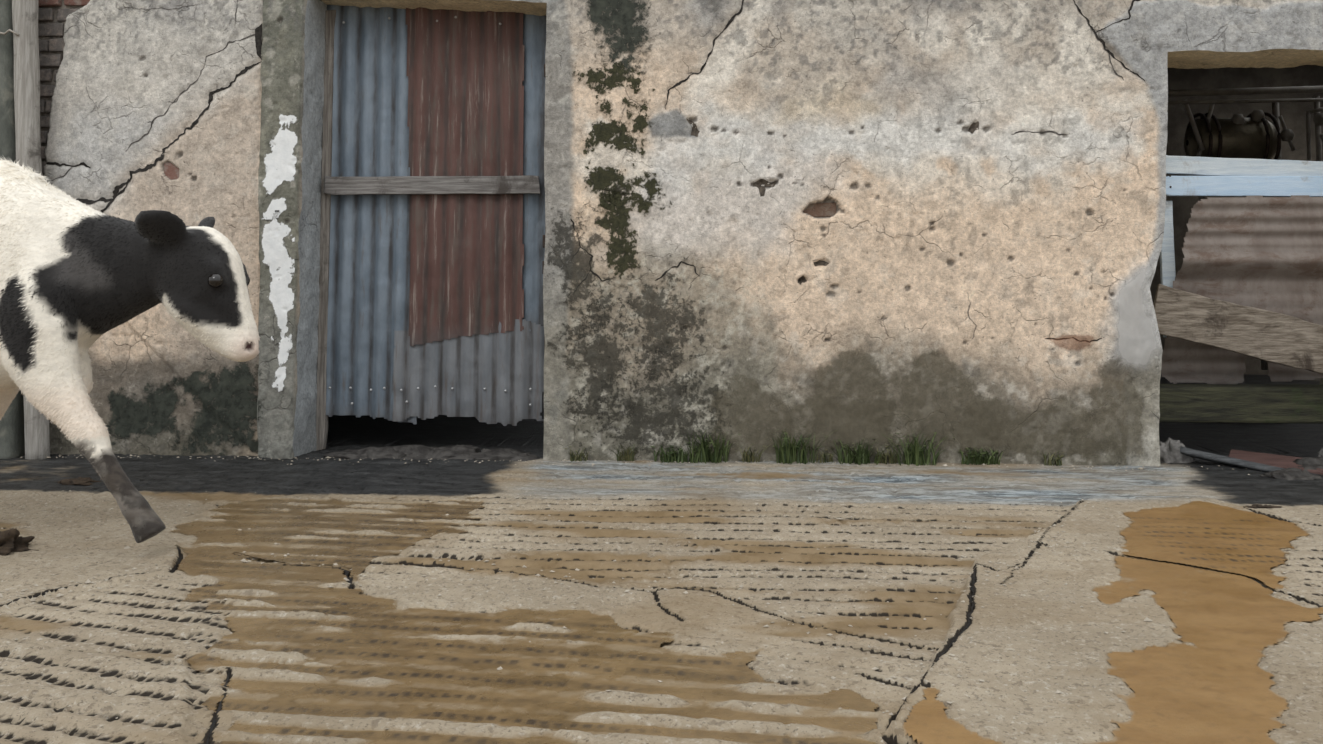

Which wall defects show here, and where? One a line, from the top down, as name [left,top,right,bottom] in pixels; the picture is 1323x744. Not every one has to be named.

spalling [38,0,90,174]
crack [46,0,260,213]
water stain [586,0,656,74]
crack [665,0,744,109]
crack [1073,0,1145,81]
peeling [262,114,297,392]
water stain [547,204,739,461]